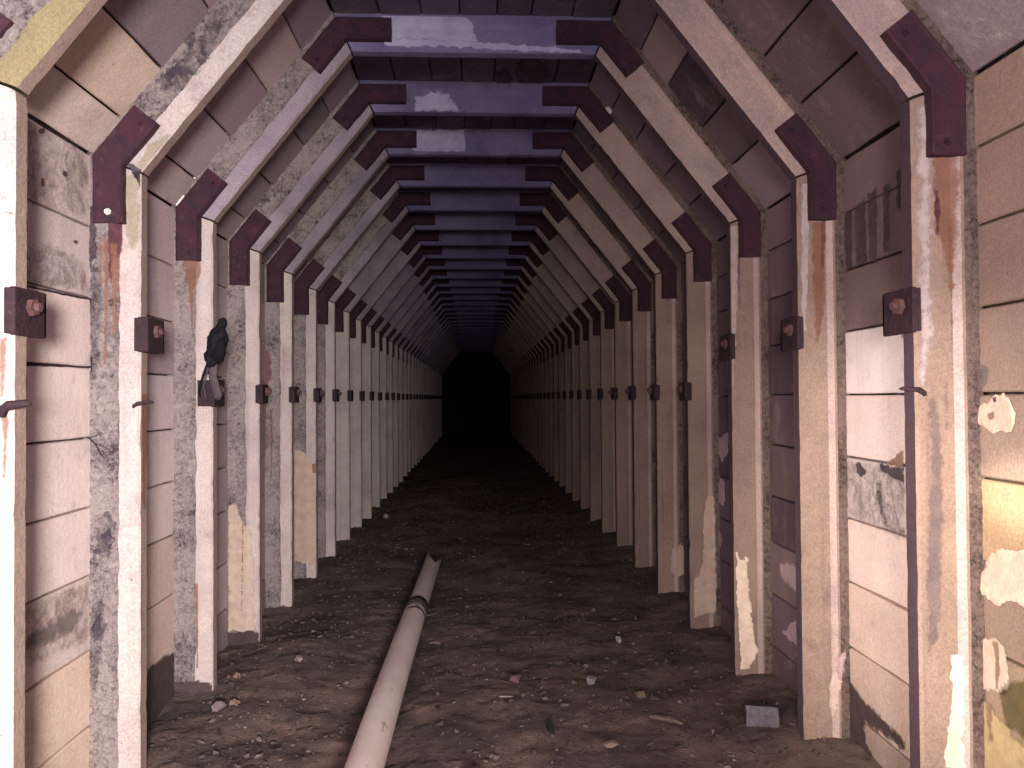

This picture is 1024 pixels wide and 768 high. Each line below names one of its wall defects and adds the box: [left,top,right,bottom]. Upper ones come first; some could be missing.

water stain [844,169,901,269]
corrosion [933,157,960,295]
corrosion [98,223,122,361]
corrosion [184,261,200,326]
corrosion [812,222,825,340]
peeling [978,393,1016,434]
water stain [847,451,905,536]
water stain [25,589,87,660]
peeling [736,552,759,669]
peeling [980,548,1024,607]
water stain [849,681,905,758]
peeling [983,637,1024,768]